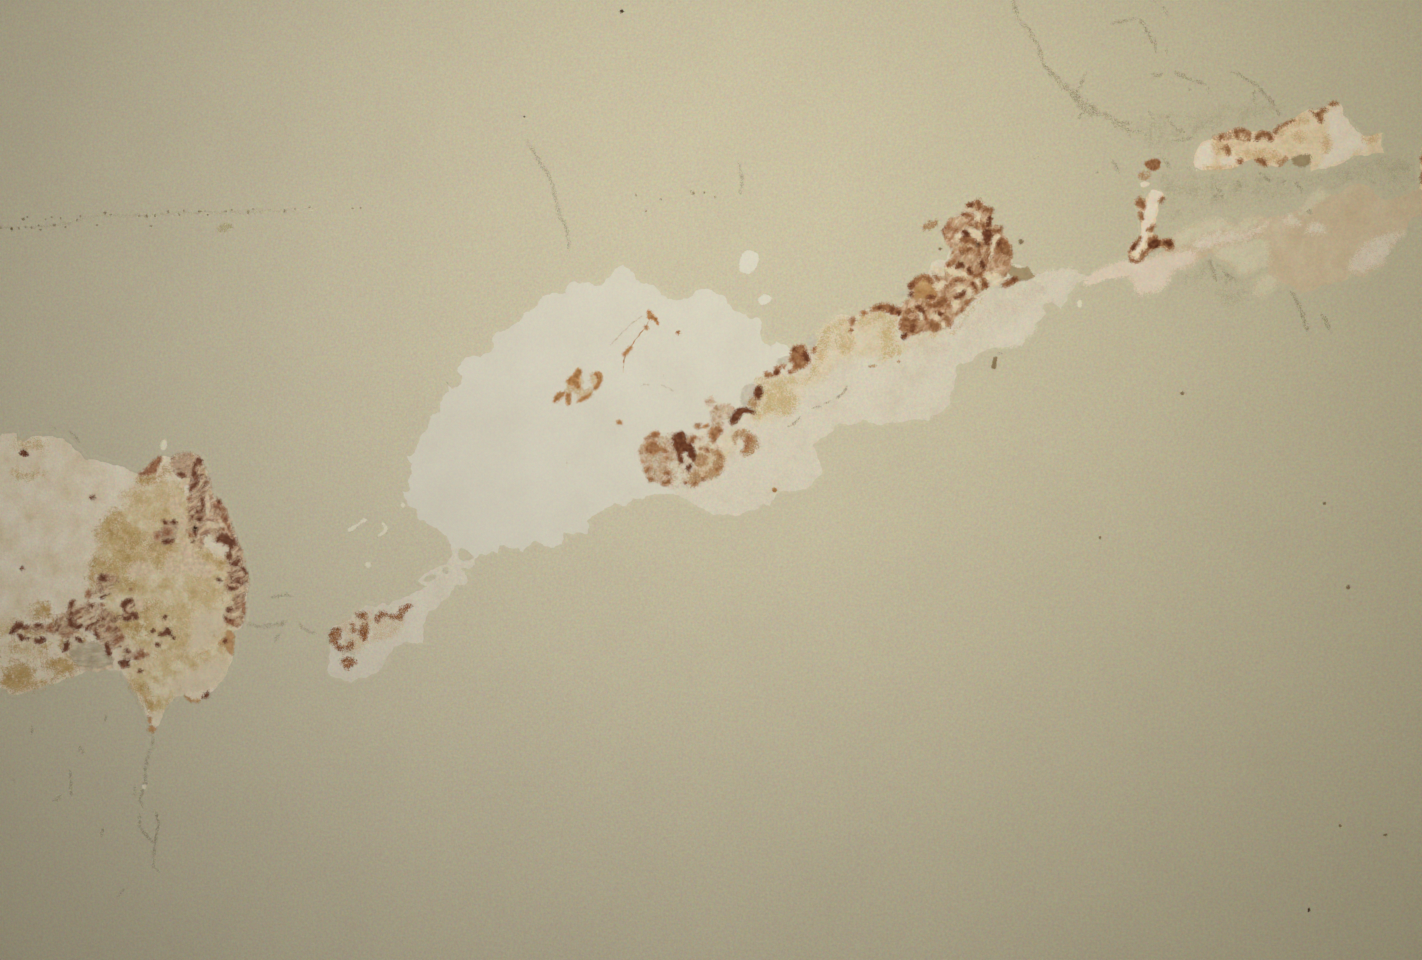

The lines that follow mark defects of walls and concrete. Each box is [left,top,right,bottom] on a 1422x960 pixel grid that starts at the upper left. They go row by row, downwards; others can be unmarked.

rust [1138,158,1162,188]
peeling [323,99,1422,687]
flaking render [0,428,254,737]